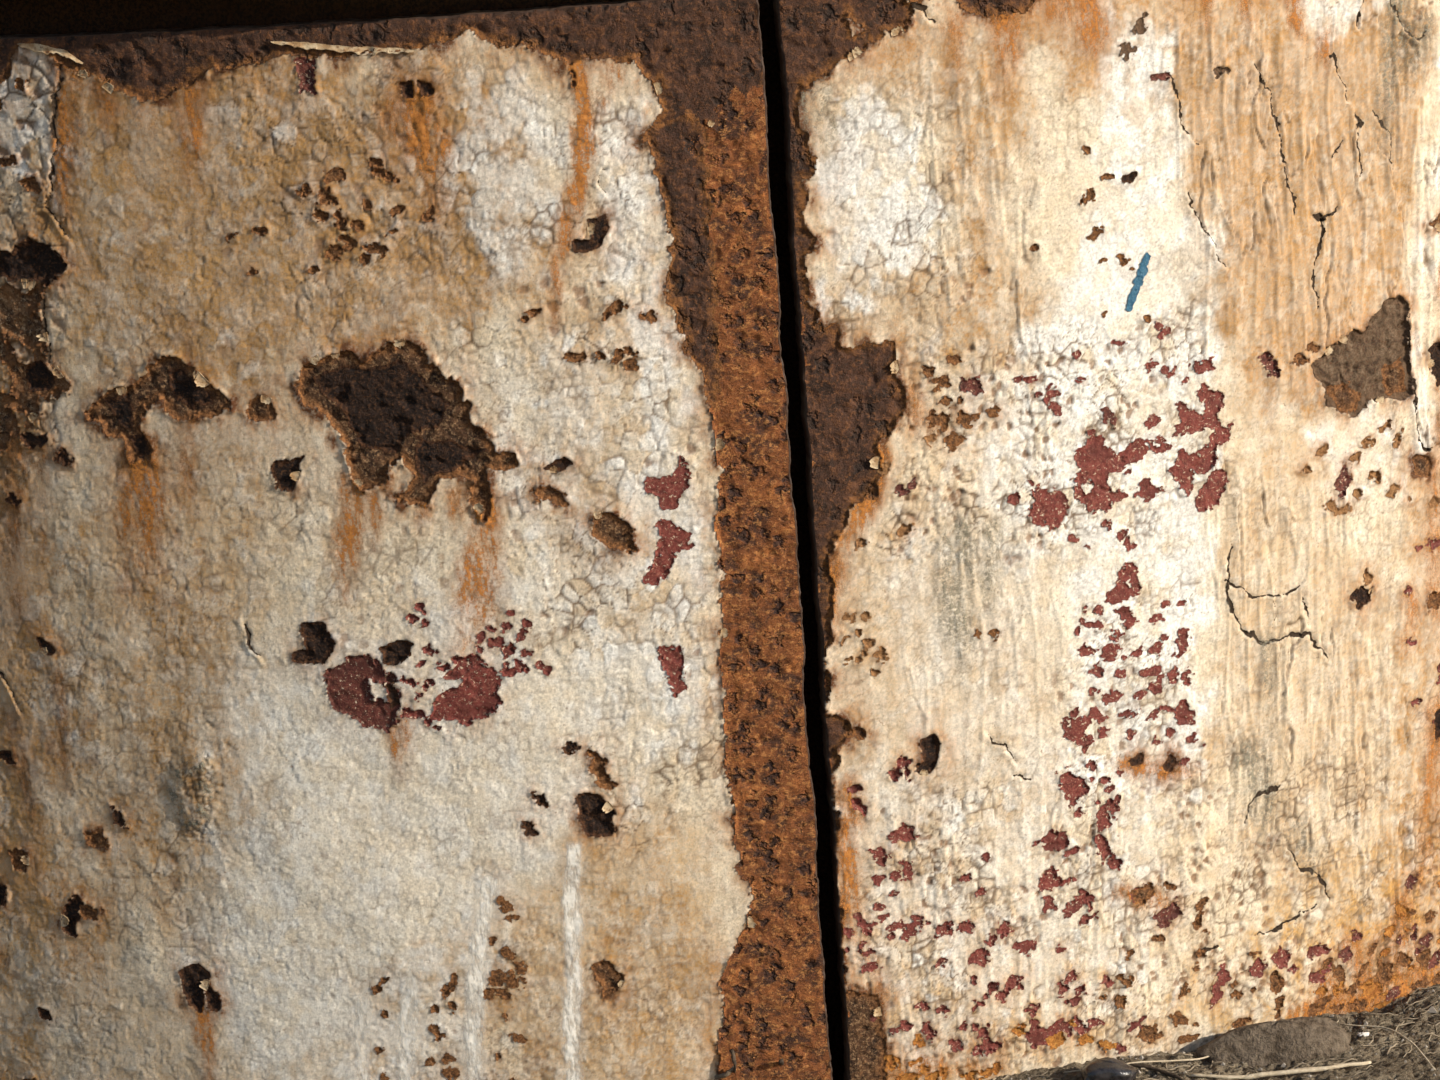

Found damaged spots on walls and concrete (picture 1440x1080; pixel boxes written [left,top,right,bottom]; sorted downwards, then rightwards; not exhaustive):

rust [951,0,1108,73]
crack [1170,74,1199,145]
crack [1188,192,1226,267]
crack [1254,63,1338,309]
peeling [293,338,519,523]
rust [0,0,831,1080]
spalling [291,603,552,733]
rust [779,0,948,1080]
spalling [1007,356,1234,926]
crack [1224,546,1328,658]
spalling [843,822,1440,1080]
rust [1288,940,1440,1019]